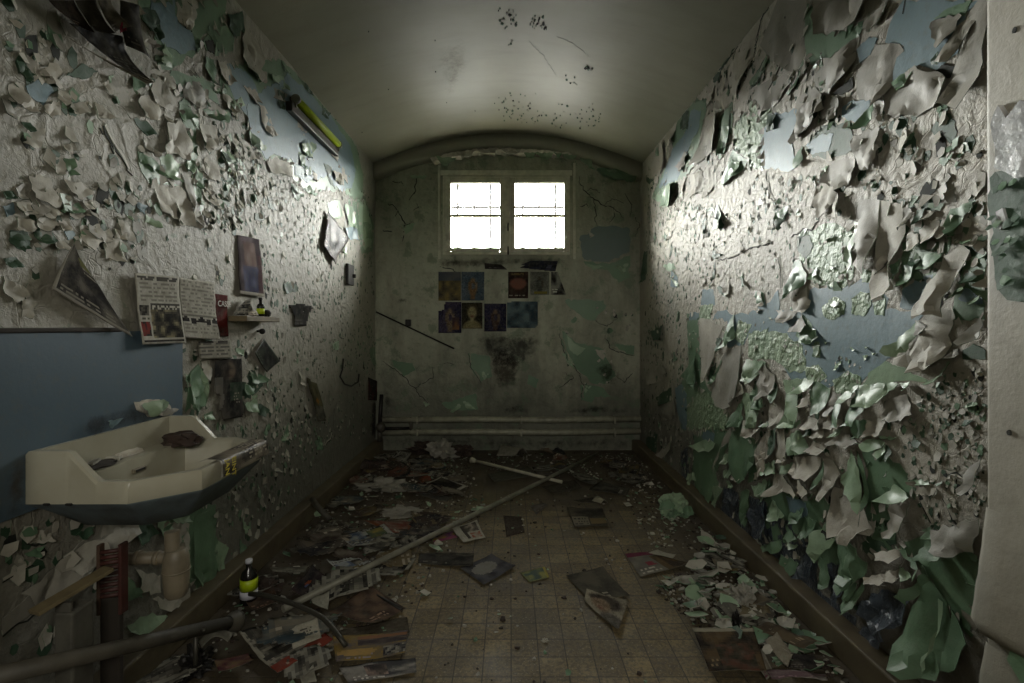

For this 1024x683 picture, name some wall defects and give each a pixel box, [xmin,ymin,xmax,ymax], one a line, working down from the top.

peeling [0,0,376,635]
peeling [430,0,1024,683]